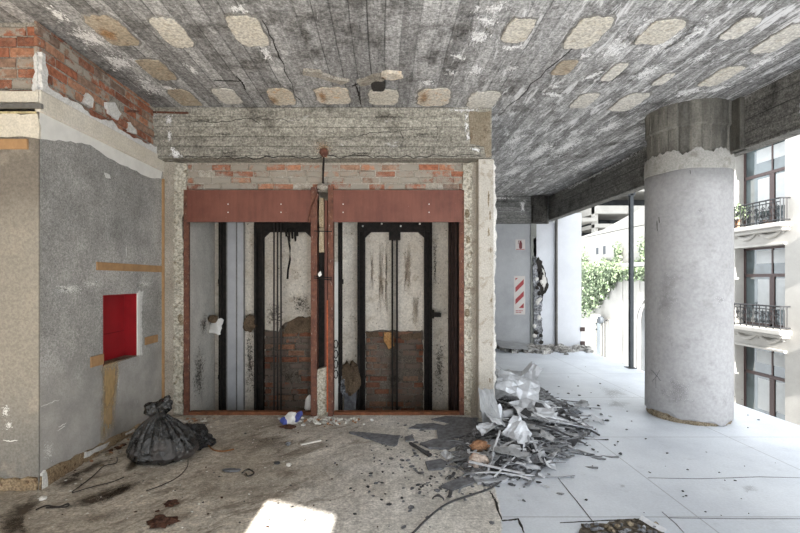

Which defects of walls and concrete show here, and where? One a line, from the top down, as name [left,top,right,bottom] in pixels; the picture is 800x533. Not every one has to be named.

spalling [81,12,142,47]
spalling [147,15,196,49]
spalling [224,12,271,48]
spalling [500,16,539,44]
spalling [549,14,617,75]
spalling [631,16,689,46]
spalling [717,16,764,40]
flaking render [0,21,157,154]
crack [192,20,302,125]
spalling [312,86,353,105]
spalling [415,86,453,107]
spalling [532,236,549,345]